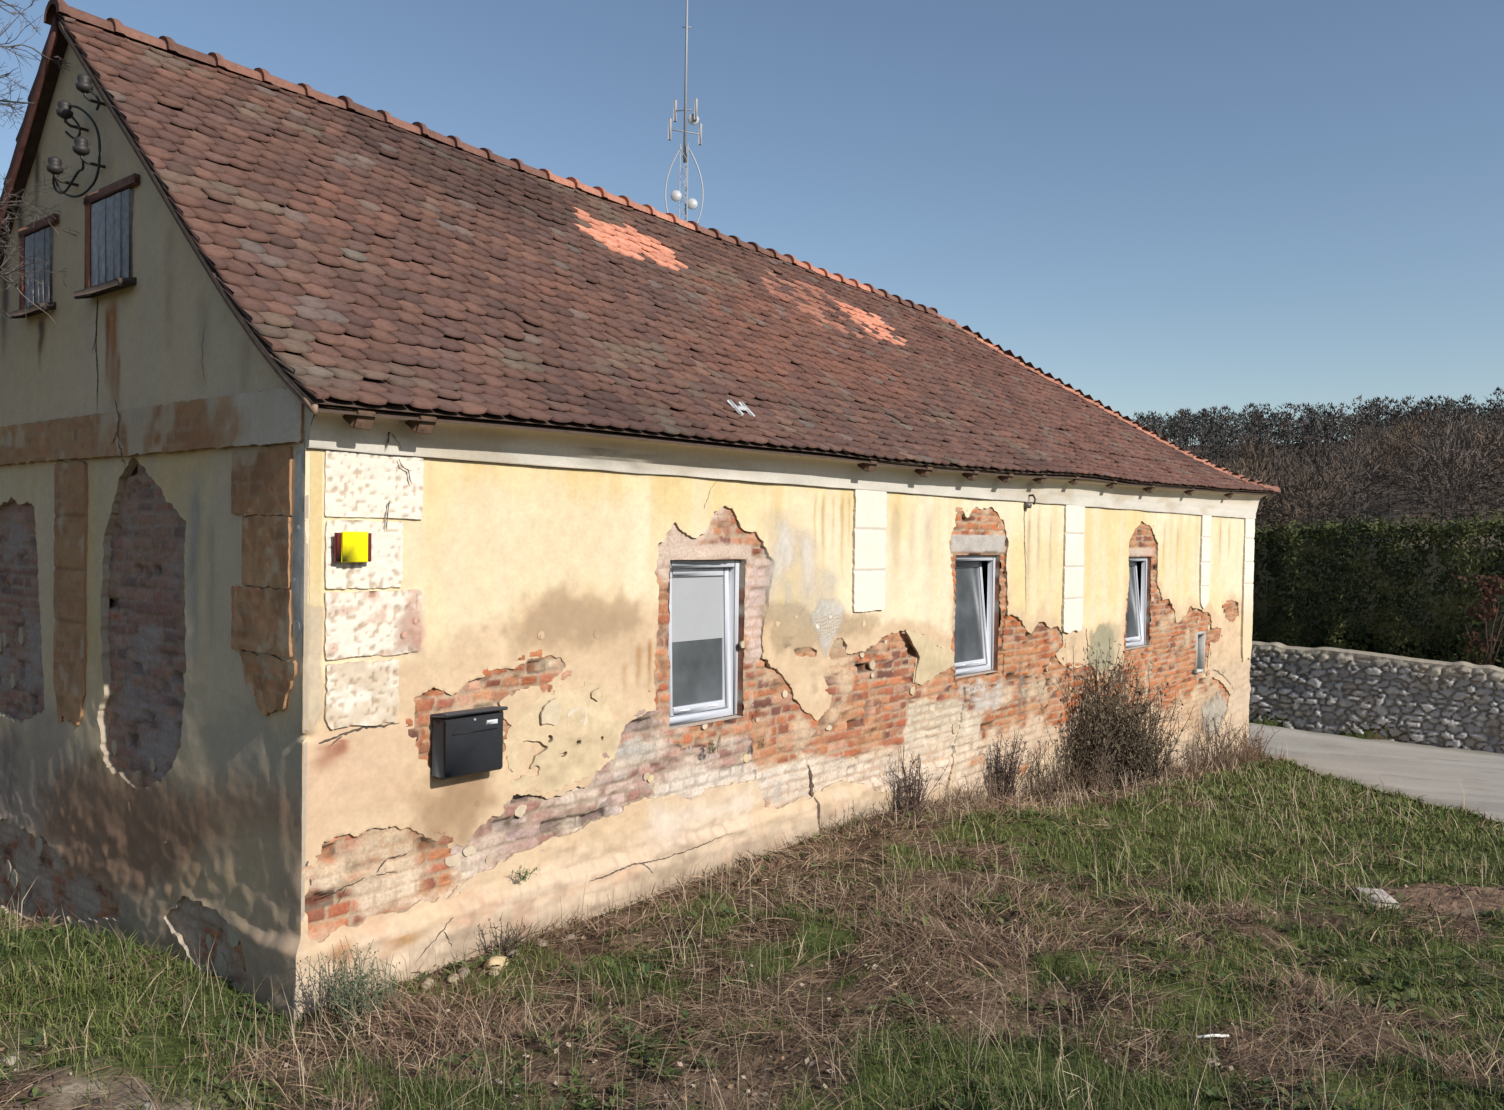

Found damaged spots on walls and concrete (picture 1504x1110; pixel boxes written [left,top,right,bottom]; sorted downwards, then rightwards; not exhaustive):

spalling [0,501,45,720]
spalling [106,459,187,787]
spalling [302,506,1238,942]
spalling [170,896,248,985]